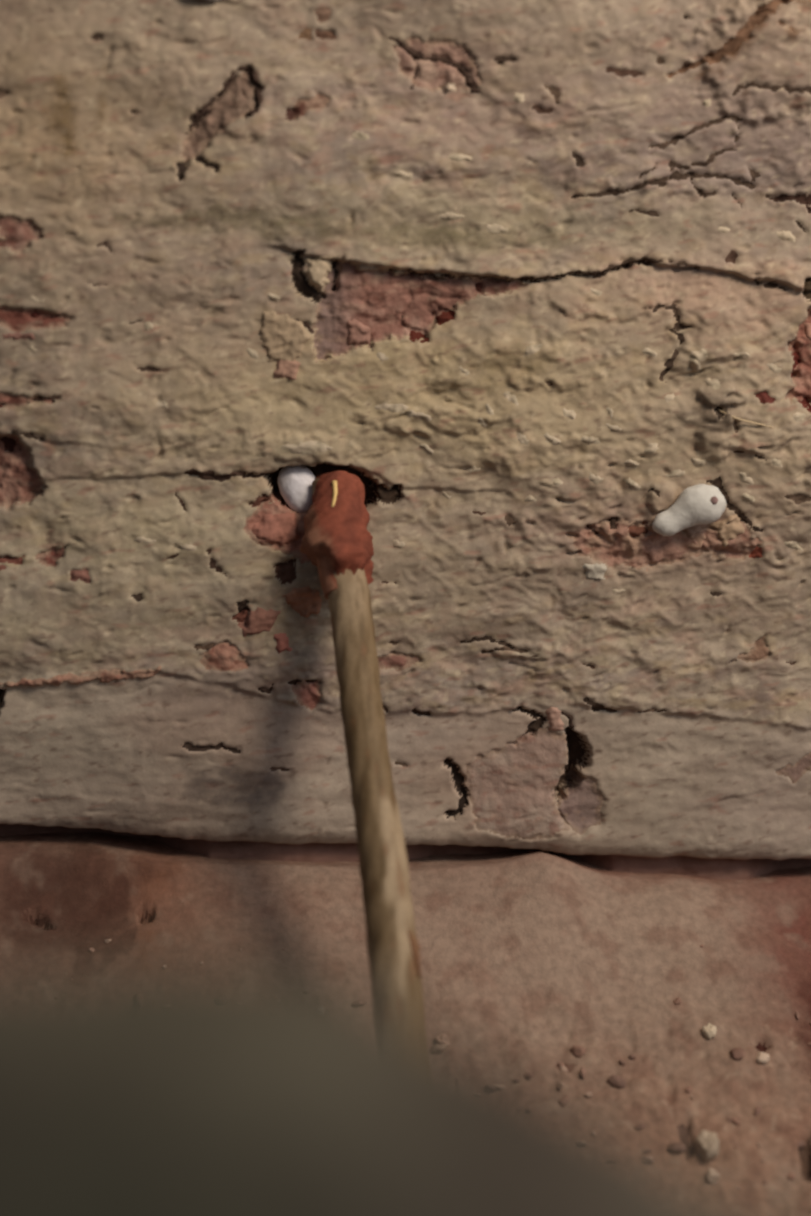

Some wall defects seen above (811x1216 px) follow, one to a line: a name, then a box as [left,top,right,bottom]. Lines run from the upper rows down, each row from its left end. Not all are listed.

spalling [176,65,266,181]
crack [571,0,811,217]
spalling [246,250,546,380]
crack [389,256,701,283]
crack [644,304,693,383]
crack [753,278,788,291]
spalling [754,278,811,422]
crack [175,468,272,512]
crack [167,548,228,576]
spalling [194,467,322,672]
spalling [567,514,763,594]
spalling [464,707,570,840]